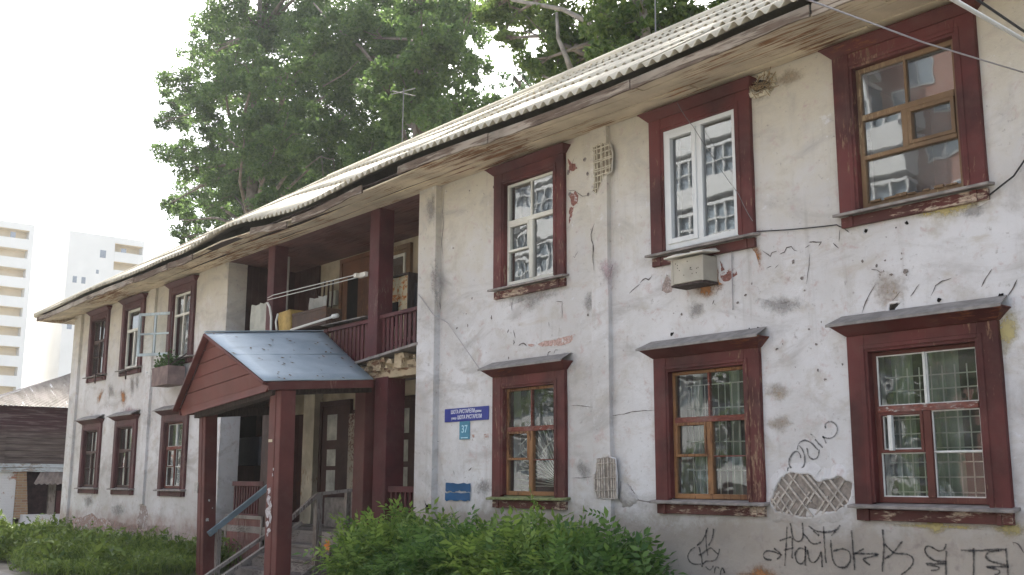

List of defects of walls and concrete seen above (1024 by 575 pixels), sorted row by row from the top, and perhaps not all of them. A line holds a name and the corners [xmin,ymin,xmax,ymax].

spalling [749,66,779,99]
peeling [567,156,589,176]
peeling [567,189,589,227]
crack [763,229,849,304]
spalling [766,462,855,527]